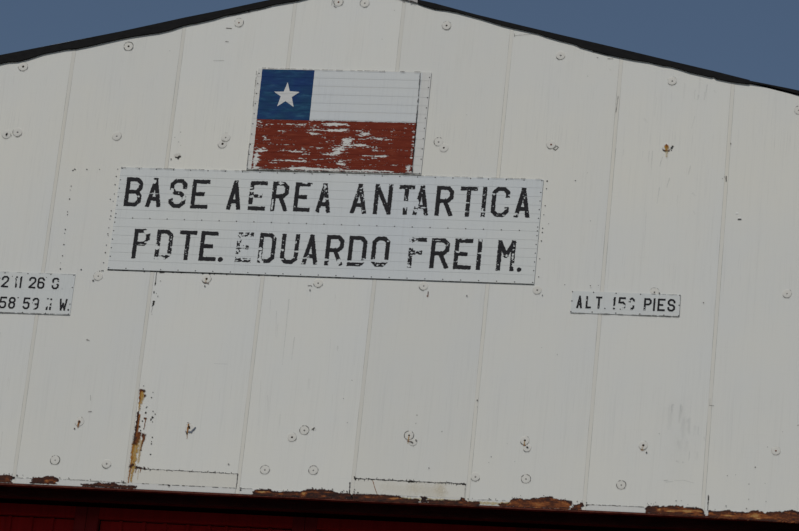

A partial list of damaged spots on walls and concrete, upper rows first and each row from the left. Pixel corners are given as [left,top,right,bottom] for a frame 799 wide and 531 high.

rust [0,389,799,524]